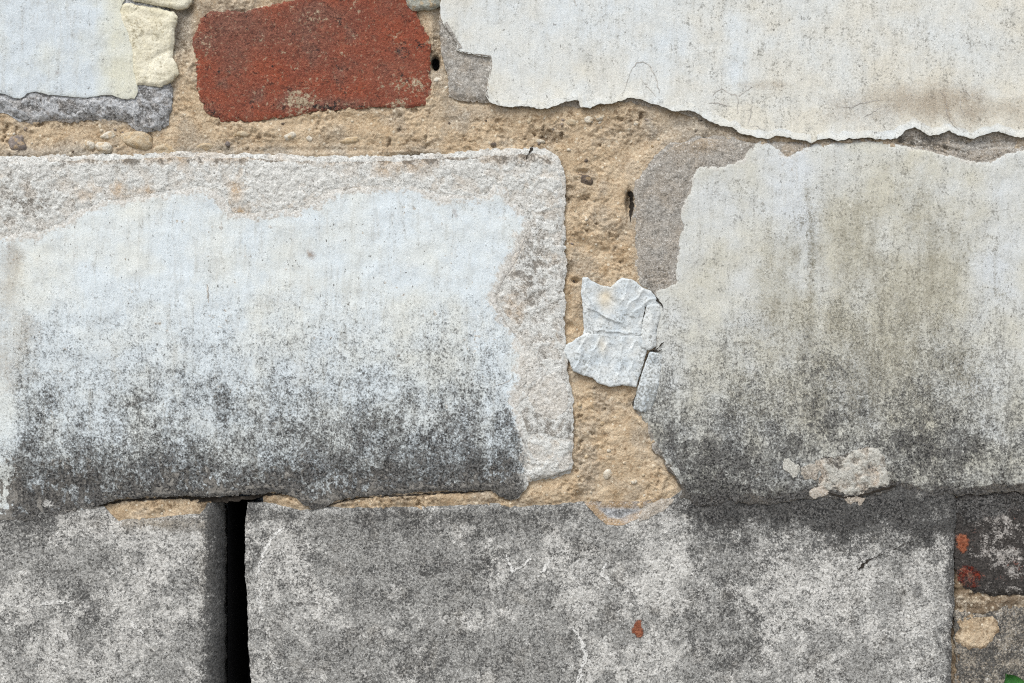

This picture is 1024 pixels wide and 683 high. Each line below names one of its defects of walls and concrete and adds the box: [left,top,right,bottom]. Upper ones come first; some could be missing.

spalling [0,0,1024,482]
mould [1,311,566,537]
leakage [646,330,1024,557]
peeling [783,446,890,506]